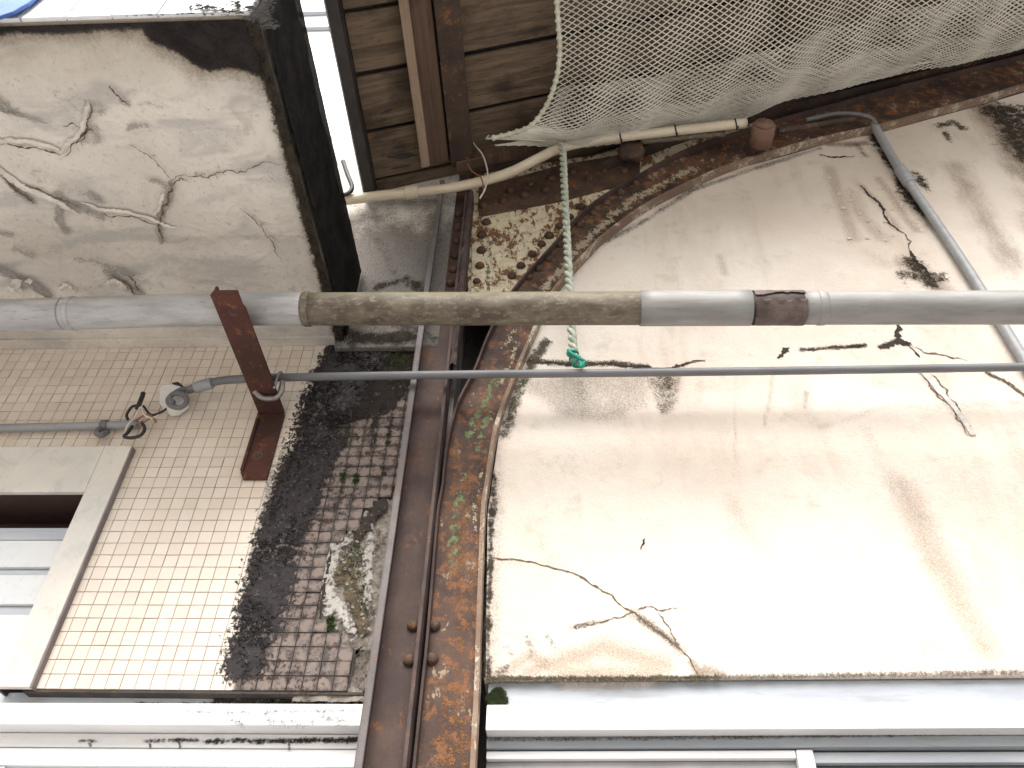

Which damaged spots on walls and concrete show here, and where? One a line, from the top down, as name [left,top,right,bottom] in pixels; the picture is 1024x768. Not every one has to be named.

crack [0,86,286,244]
water stain [0,0,361,292]
water stain [373,271,424,291]
crack [860,185,932,280]
crack [777,325,1024,437]
water stain [145,326,417,750]
spalling [292,487,395,702]
corrosion [433,474,475,768]
crack [492,557,698,674]